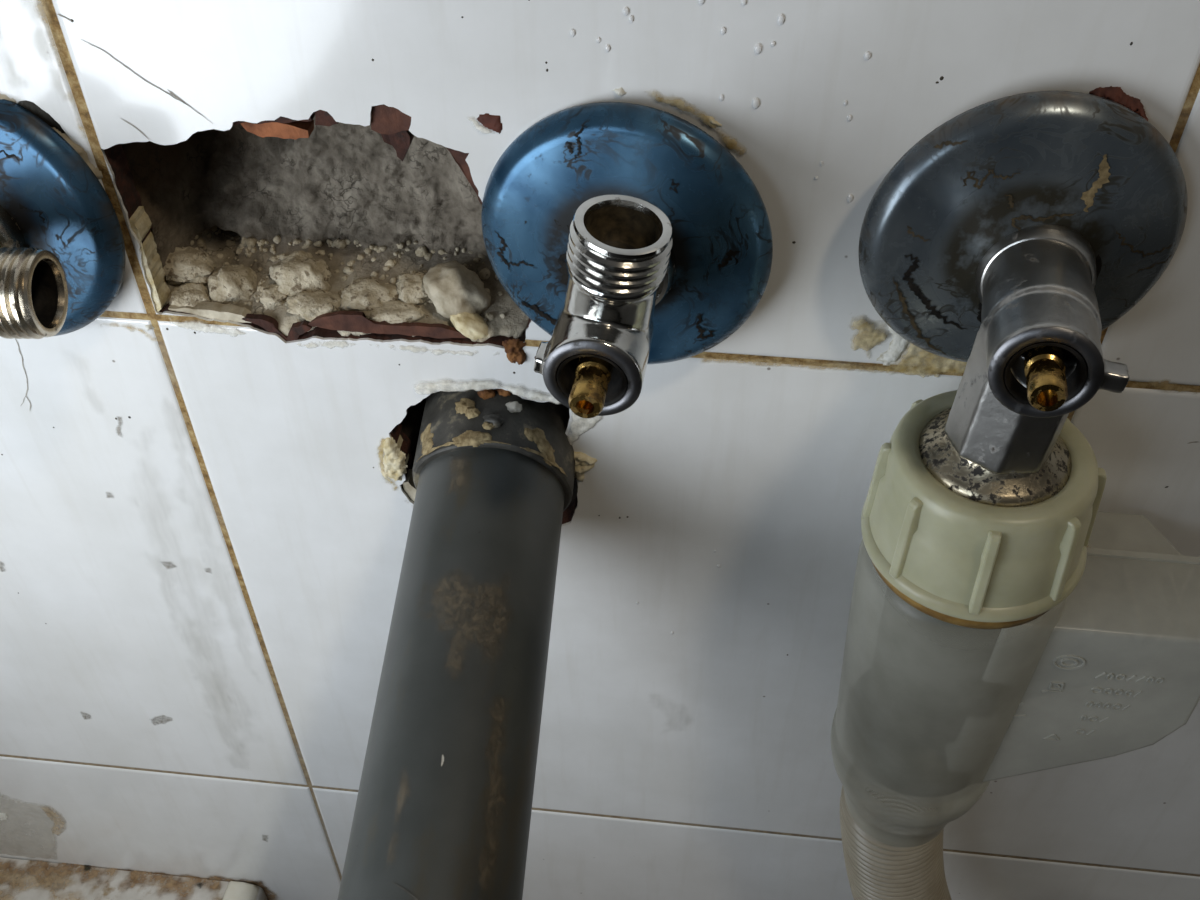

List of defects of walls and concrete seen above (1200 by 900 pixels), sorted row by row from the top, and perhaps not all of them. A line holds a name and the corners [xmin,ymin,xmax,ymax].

crack [58,14,213,124]
spalling [121,104,529,356]
spalling [378,381,560,501]
spalling [568,413,601,503]